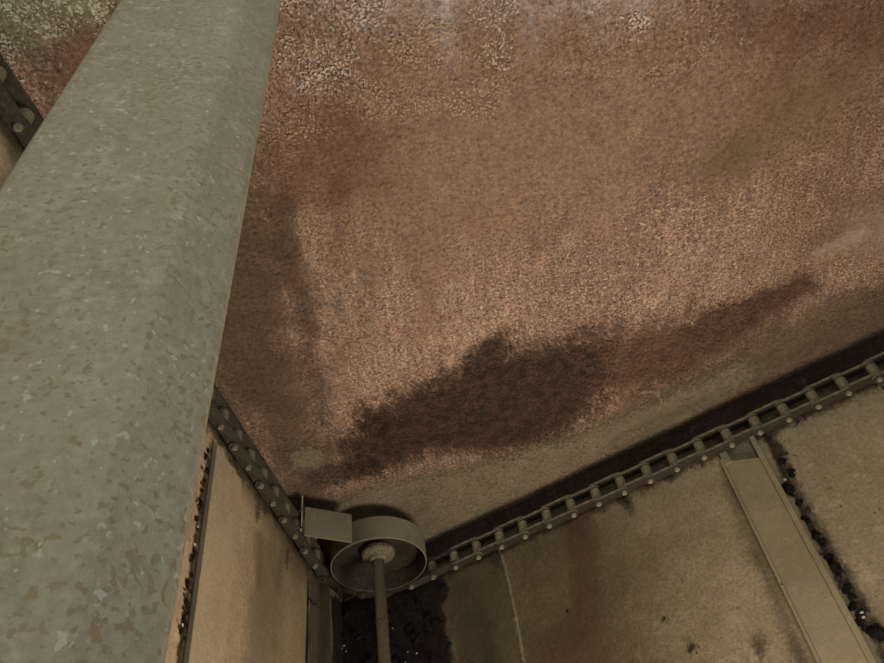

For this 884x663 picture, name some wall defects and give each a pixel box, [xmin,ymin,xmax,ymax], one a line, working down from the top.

leakage [215,168,884,546]